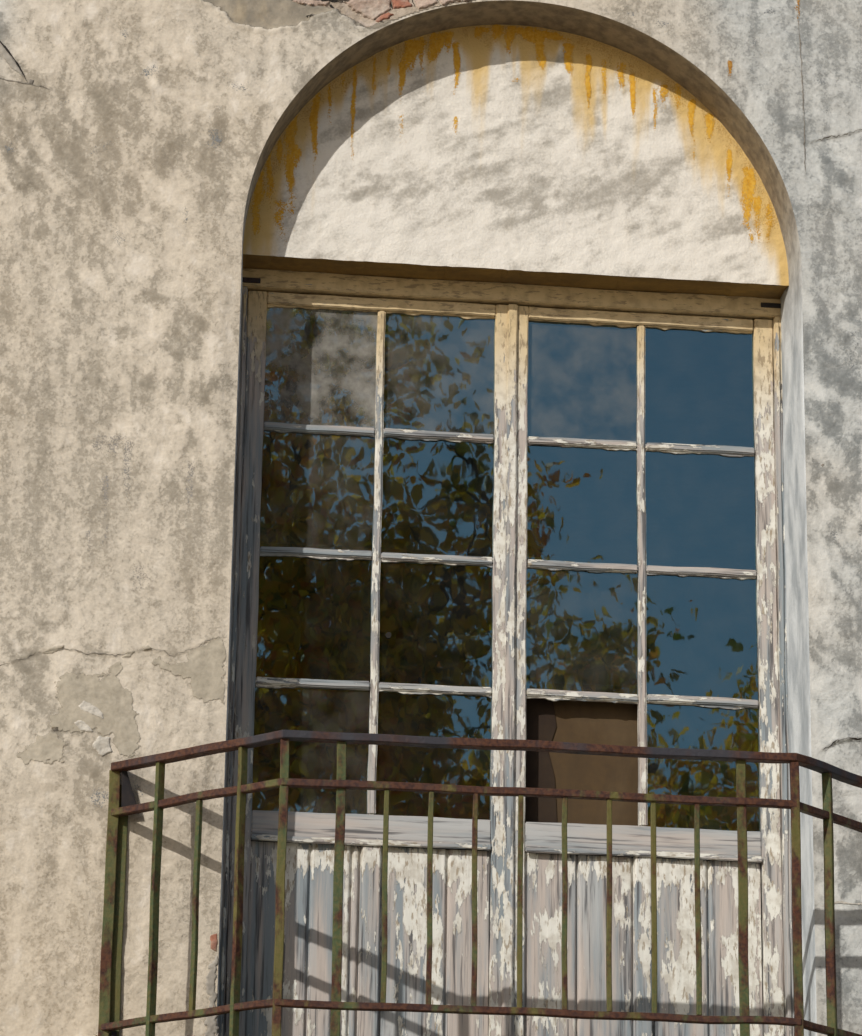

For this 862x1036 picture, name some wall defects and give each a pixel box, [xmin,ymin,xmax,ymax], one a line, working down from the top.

peeling [203,0,471,29]
water stain [248,24,780,243]
crack [798,19,862,176]
peeling [16,662,141,764]
peeling [152,636,226,704]